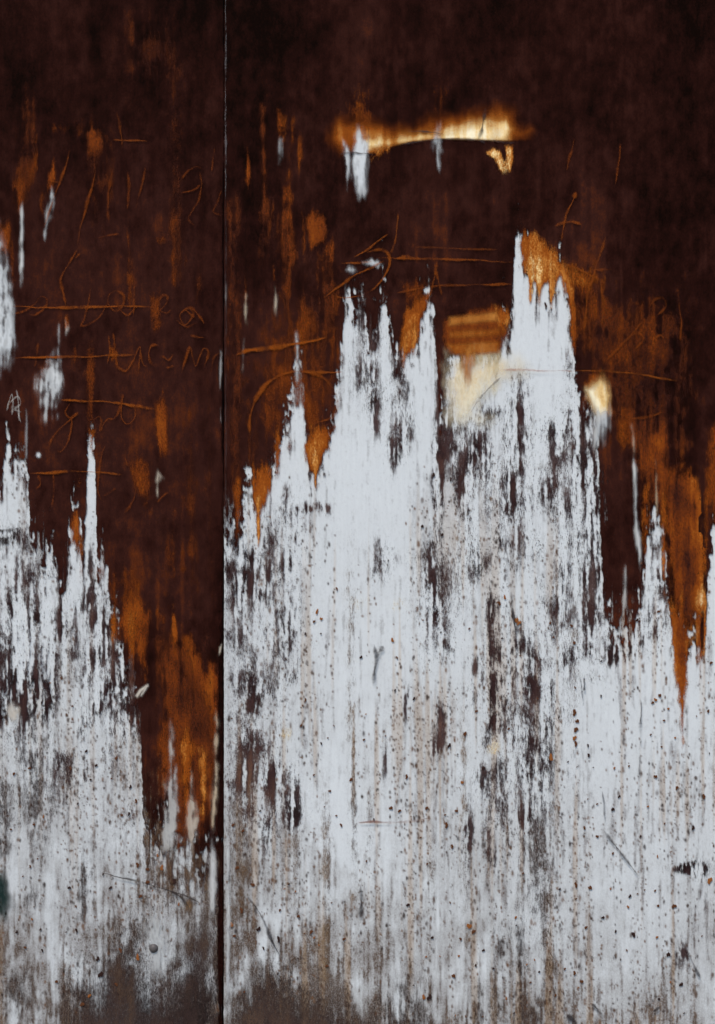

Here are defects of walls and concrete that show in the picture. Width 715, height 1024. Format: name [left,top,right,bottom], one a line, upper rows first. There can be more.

rust [332,95,528,172]
rust [220,106,341,542]
peeling [355,355,381,436]
peeling [389,419,415,472]
rust [442,303,510,409]
peeling [491,375,532,569]
rust [520,231,715,744]
peeling [6,556,40,639]
peeling [264,525,285,587]
peeling [0,632,60,761]
rust [98,567,255,1024]
peeling [188,726,223,912]